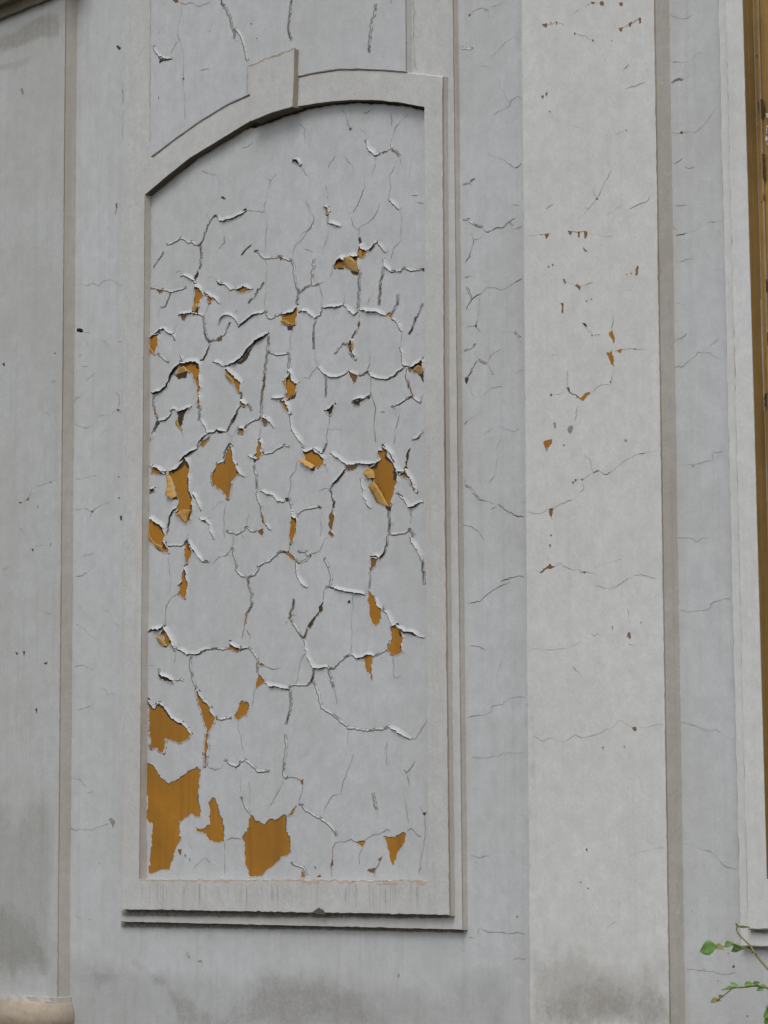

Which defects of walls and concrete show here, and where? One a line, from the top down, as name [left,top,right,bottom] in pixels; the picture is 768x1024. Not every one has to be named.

crack [153,0,249,113]
crack [150,394,172,441]
peeling [147,432,211,600]
peeling [149,246,253,434]
crack [149,516,287,686]
crack [153,171,403,434]
peeling [280,188,342,330]
peeling [210,237,426,681]
crack [360,478,426,585]
peeling [543,315,645,451]
peeling [141,640,427,885]
crack [208,557,425,873]